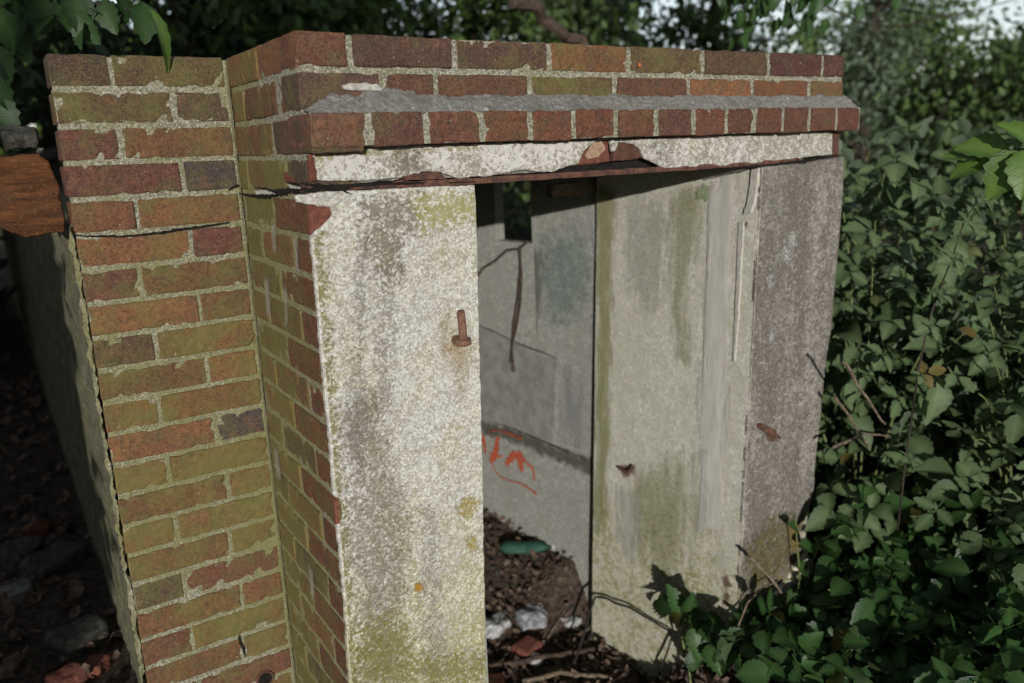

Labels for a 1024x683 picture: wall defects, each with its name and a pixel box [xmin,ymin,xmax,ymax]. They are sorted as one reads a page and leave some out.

spalling [481,140,652,174]
corrosion [393,172,447,183]
crack [228,178,476,201]
crack [72,222,229,238]